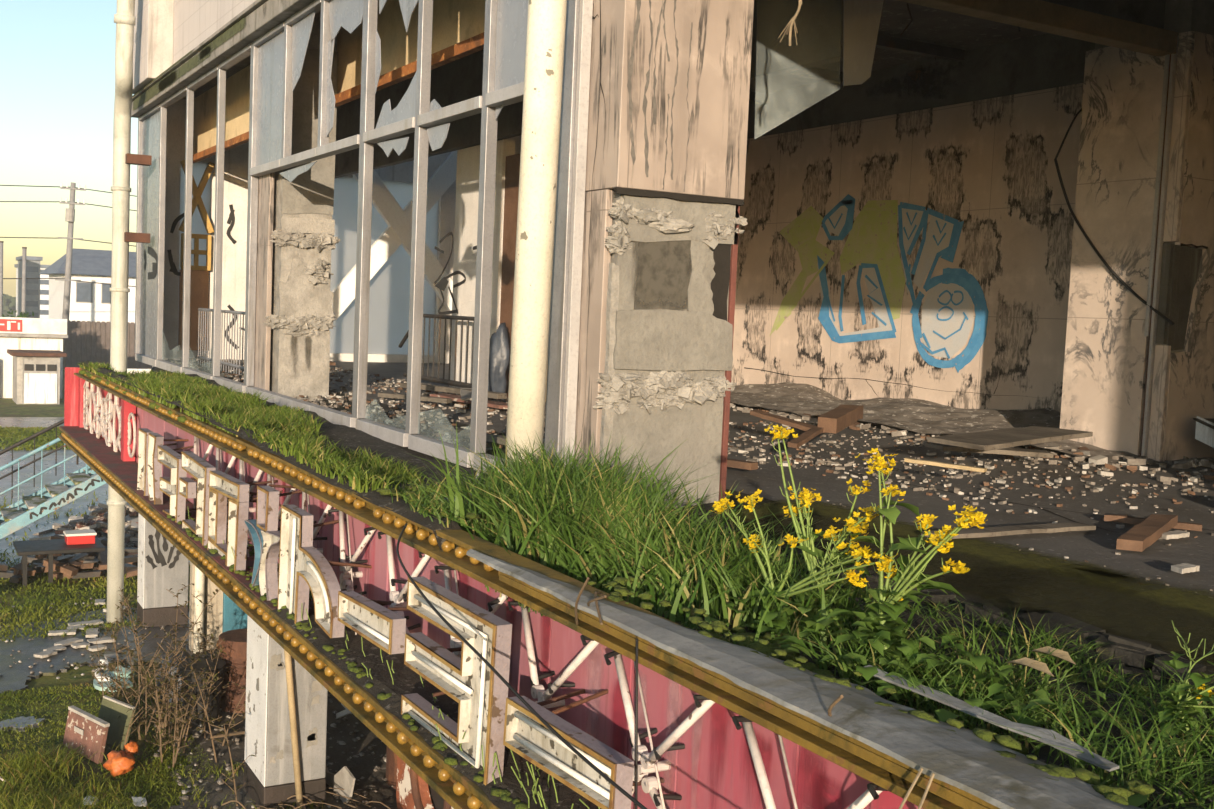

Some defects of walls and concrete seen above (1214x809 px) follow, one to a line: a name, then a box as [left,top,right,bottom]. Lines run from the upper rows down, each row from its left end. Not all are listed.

leakage [627,0,693,192]
spalling [263,49,341,397]
spalling [592,187,897,599]
leakage [743,513,1214,666]
spalling [918,592,1206,695]